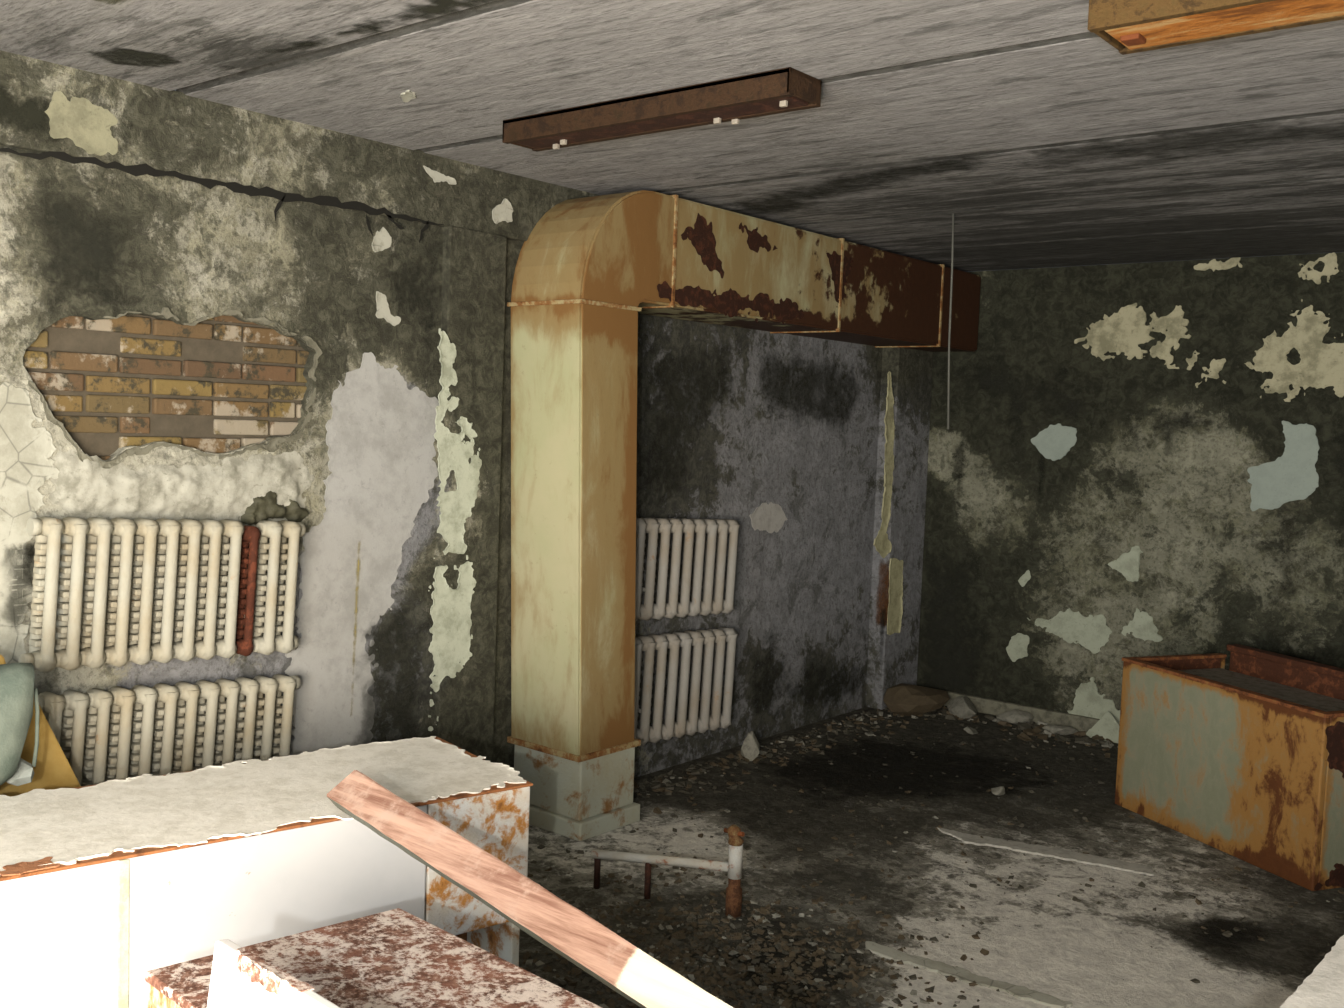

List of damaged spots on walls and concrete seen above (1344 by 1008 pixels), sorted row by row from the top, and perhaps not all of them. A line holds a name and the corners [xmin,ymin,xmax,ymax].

leakage [89,48,178,67]
leakage [338,0,498,35]
leakage [0,87,57,140]
crack [0,148,444,242]
rust [657,213,804,324]
rust [826,251,853,303]
peeling [1074,303,1226,388]
peeling [1245,299,1344,402]
flaking render [0,307,322,664]
peeling [1247,420,1320,511]
peeling [285,328,482,755]
leakage [364,611,418,743]